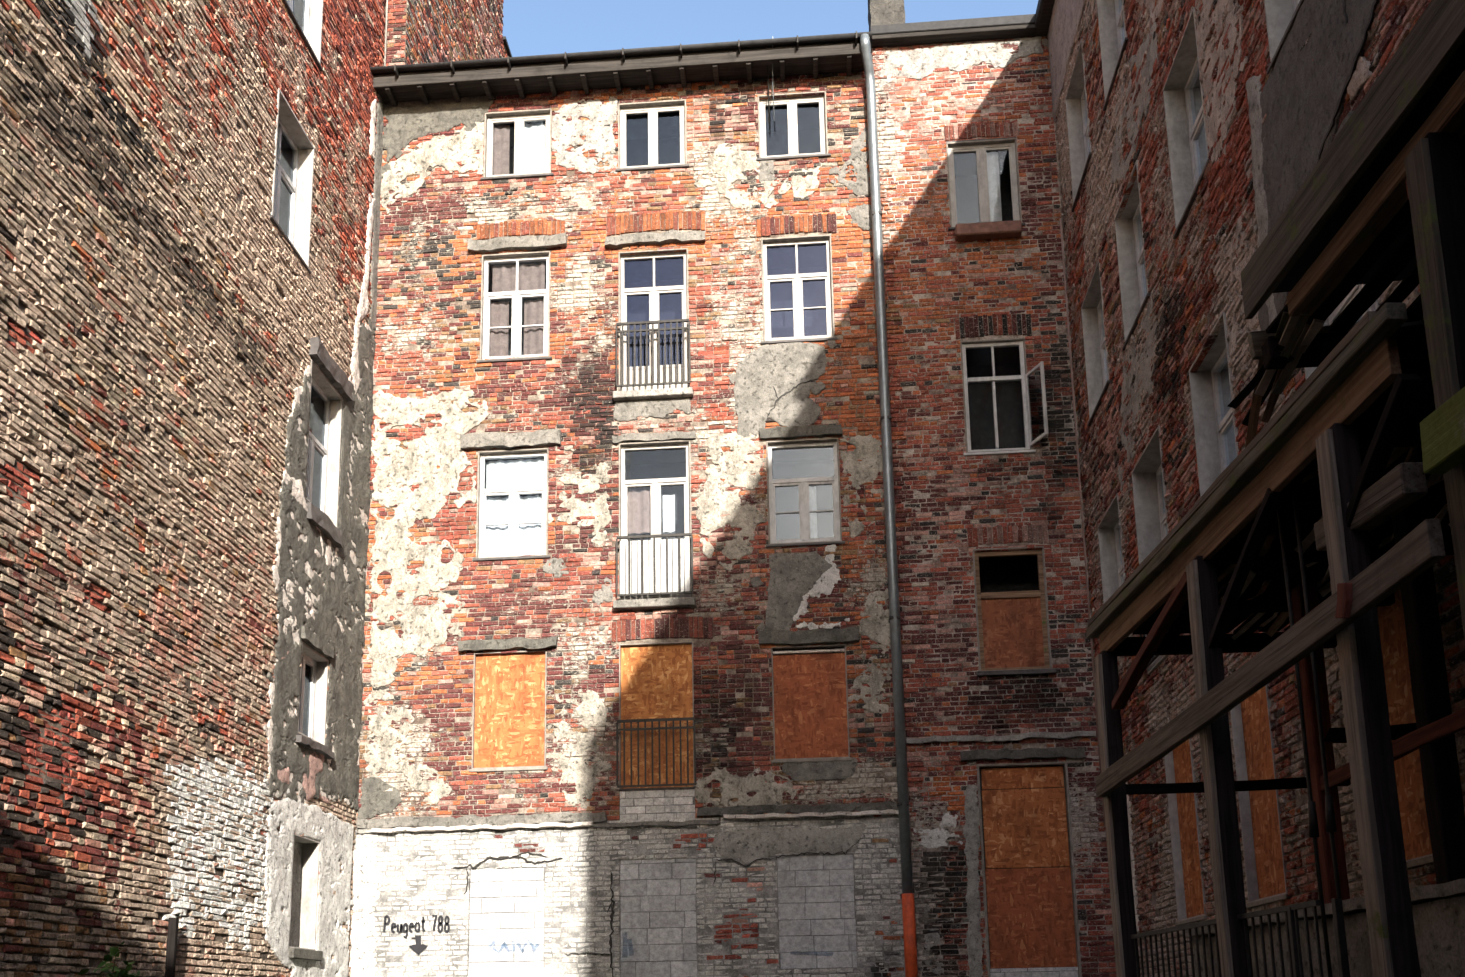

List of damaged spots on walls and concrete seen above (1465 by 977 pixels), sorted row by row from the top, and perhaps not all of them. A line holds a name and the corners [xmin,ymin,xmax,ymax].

leakage [95,73,159,171]
peeling [552,97,627,177]
peeling [693,127,872,231]
peeling [162,93,494,977]
peeling [542,445,613,630]
peeling [793,434,905,714]
peeling [548,687,613,809]
crack [453,852,563,894]